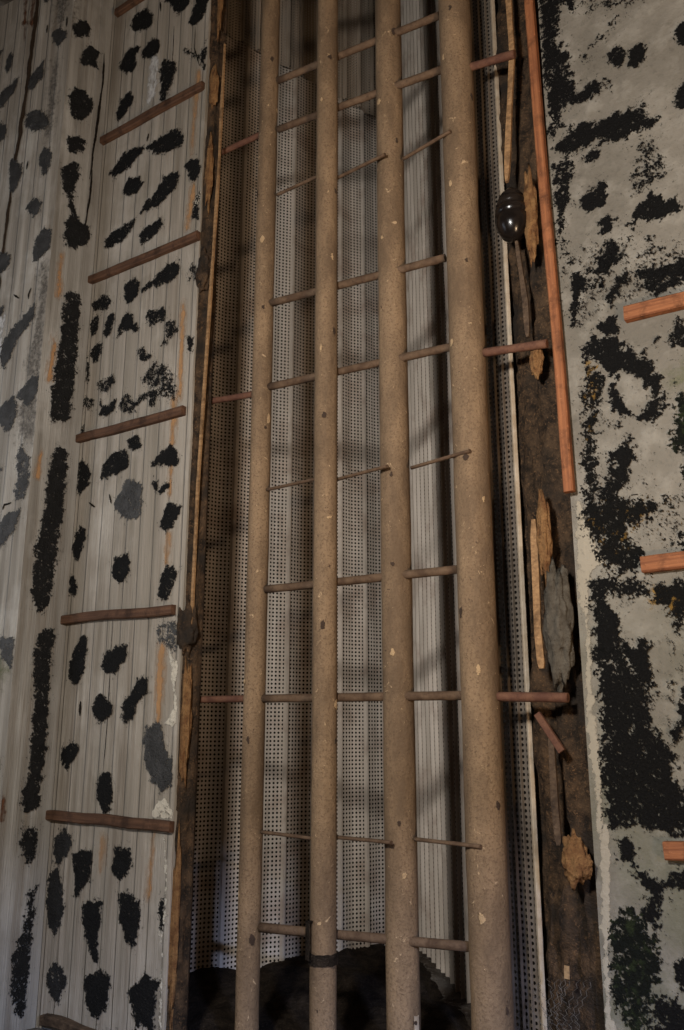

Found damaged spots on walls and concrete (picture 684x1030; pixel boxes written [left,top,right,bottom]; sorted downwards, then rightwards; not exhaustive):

leakage [581,0,645,18]
leakage [147,56,158,104]
leakage [573,77,613,104]
leakage [628,135,674,198]
leakage [556,217,683,328]
leakage [576,382,684,743]